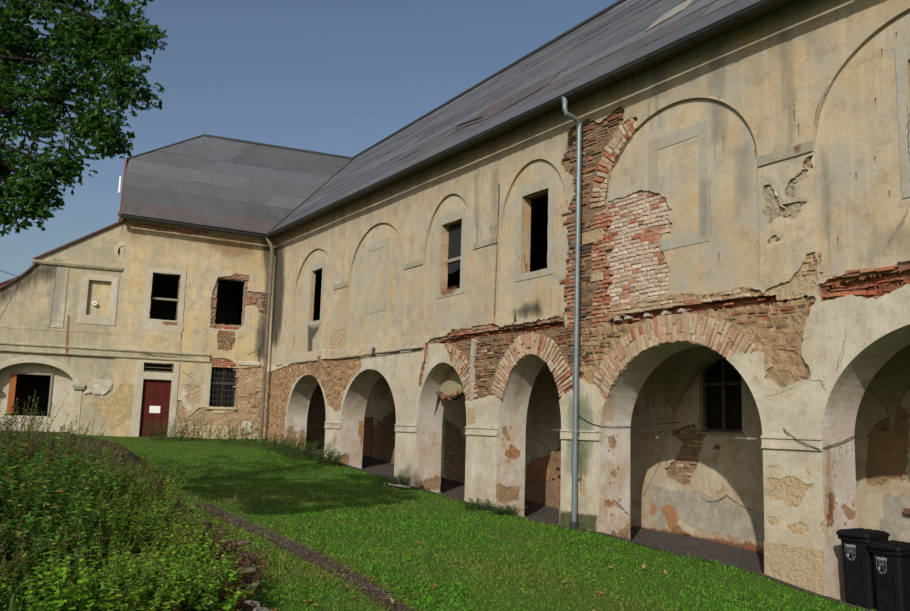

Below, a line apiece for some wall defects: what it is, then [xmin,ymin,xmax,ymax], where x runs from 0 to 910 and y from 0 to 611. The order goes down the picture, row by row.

spalling [177,274,362,450]
leakage [514,304,540,323]
spalling [416,106,910,497]
crack [700,495,752,510]
spalling [865,404,910,542]